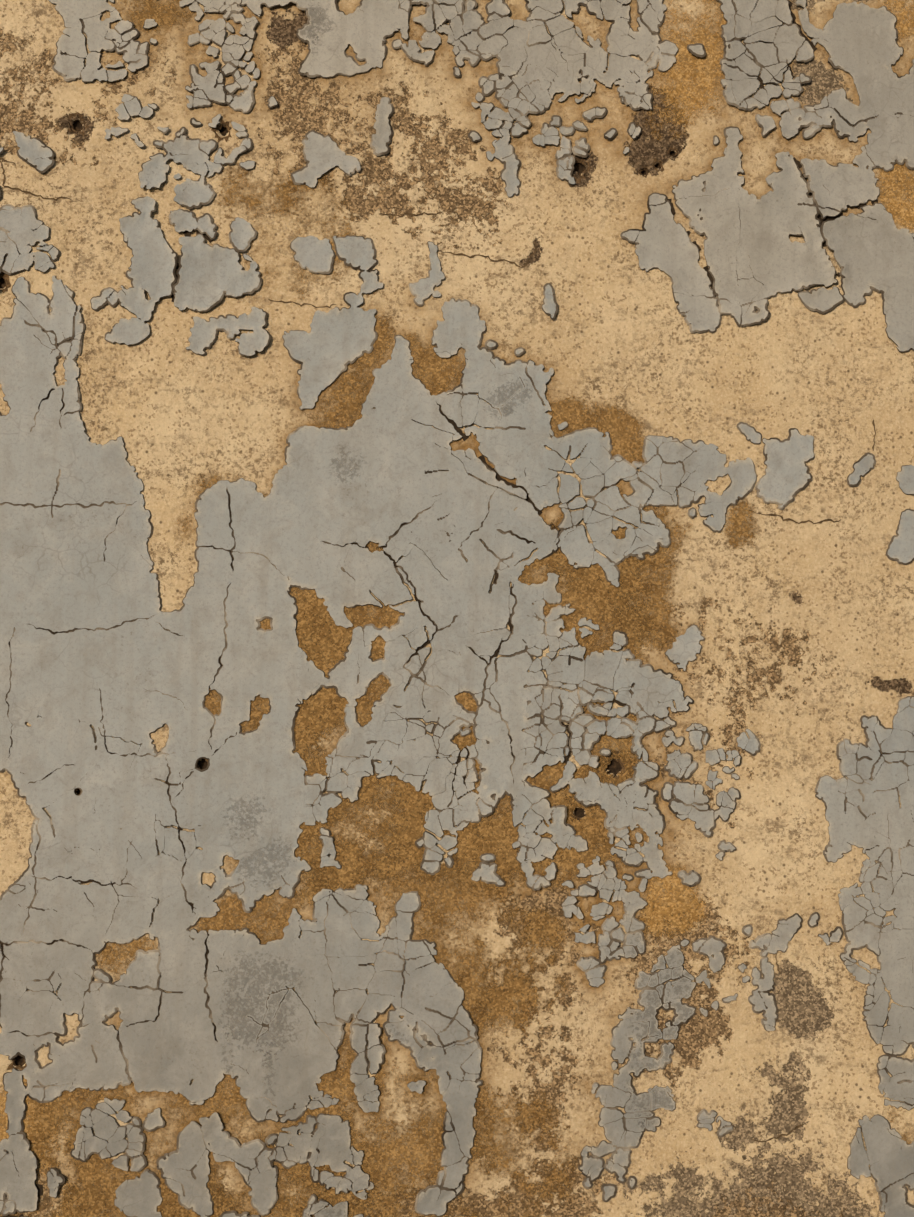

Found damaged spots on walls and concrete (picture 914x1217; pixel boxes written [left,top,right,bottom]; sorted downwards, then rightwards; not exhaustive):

crack [732,1,834,92]
crack [793,157,878,247]
peeling [449,394,527,499]
crack [437,404,561,544]
crack [341,523,435,663]
crack [469,568,515,665]
peeling [472,655,501,713]
crack [561,698,626,768]
peeling [471,853,505,887]
peeling [89,934,161,992]
peeling [0,1013,80,1098]
spalling [711,1187,808,1217]